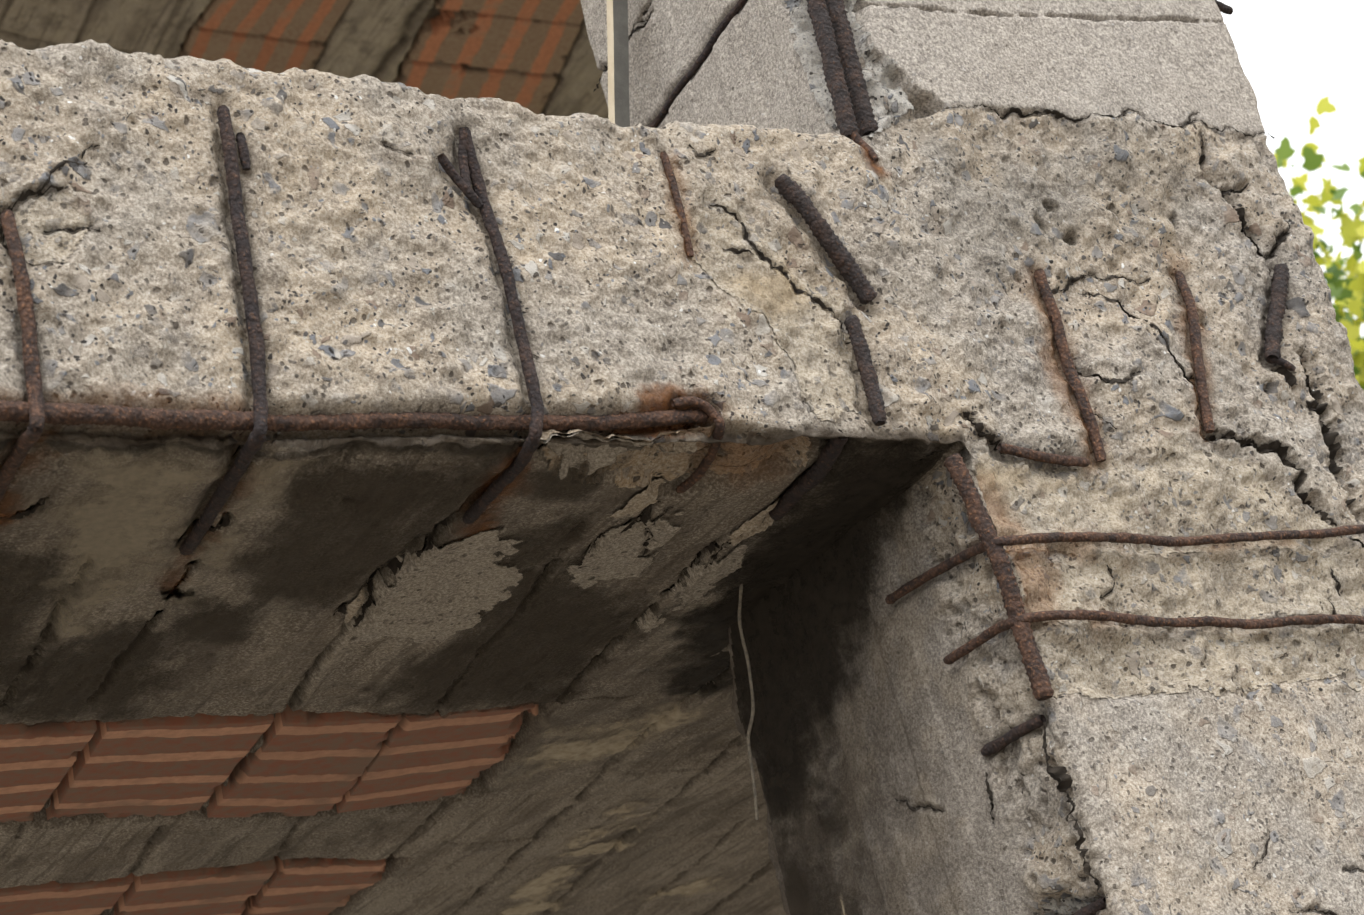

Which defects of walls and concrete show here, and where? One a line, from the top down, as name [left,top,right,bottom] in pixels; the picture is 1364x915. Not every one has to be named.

spalling [3,191,93,265]
crack [0,144,101,249]
spalling [681,184,860,422]
crack [709,204,849,344]
crack [932,104,1291,284]
corrosion [609,386,710,437]
crack [963,412,1002,454]
leakage [0,456,494,722]
peeling [342,530,523,644]
leakage [528,440,946,835]
spalling [975,432,1364,699]
leakage [784,817,860,915]